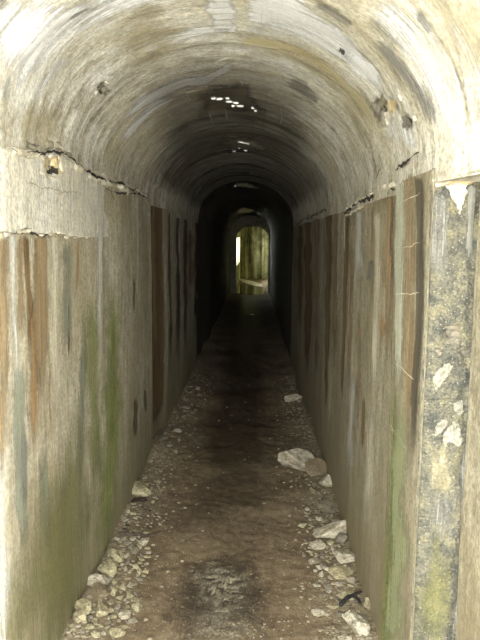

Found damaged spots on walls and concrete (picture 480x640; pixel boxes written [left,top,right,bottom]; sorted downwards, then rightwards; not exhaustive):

peeling [0,145,109,240]
crack [6,141,150,201]
crack [298,152,419,223]
spalling [371,94,416,141]
spalling [435,181,474,214]
leakage [466,184,477,260]
corrosion [0,239,10,462]
leakage [10,235,29,539]
corrosion [17,236,51,431]
leakage [78,327,87,459]
corrosion [151,206,165,421]
corrosion [298,215,365,443]